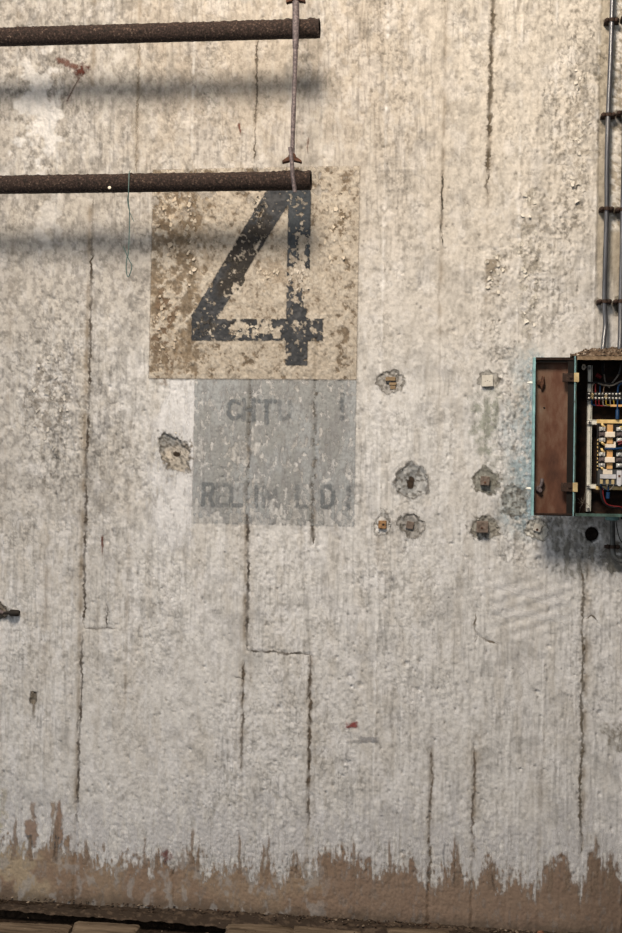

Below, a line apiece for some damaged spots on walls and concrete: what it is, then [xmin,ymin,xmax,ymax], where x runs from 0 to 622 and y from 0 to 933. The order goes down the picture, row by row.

crack [485,10,496,187]
spalling [375,369,405,395]
spalling [158,432,194,477]
spalling [393,460,429,499]
spalling [373,508,426,539]
spalling [469,465,549,541]
leakage [0,793,622,933]